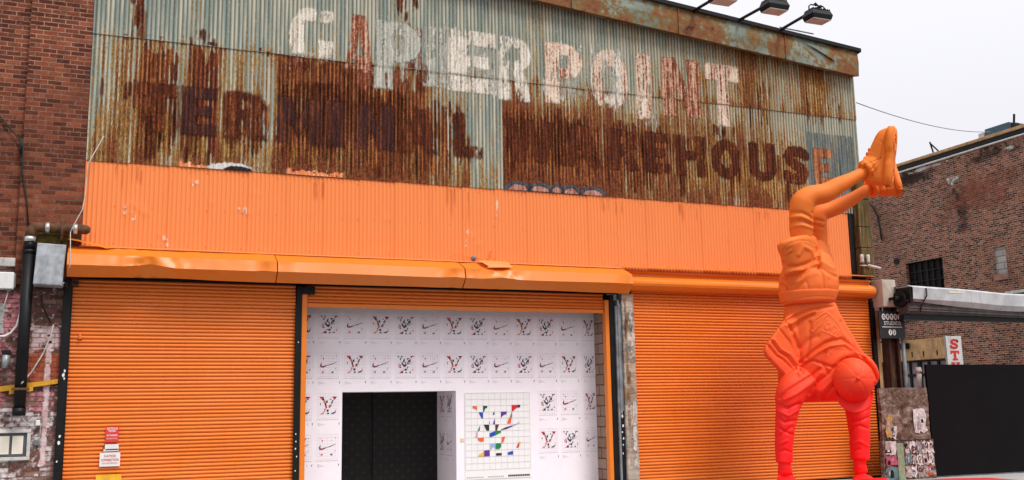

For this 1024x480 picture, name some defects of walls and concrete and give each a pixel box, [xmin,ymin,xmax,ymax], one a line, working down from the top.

rust [94,0,471,180]
rust [504,68,809,206]
rust [805,75,841,126]